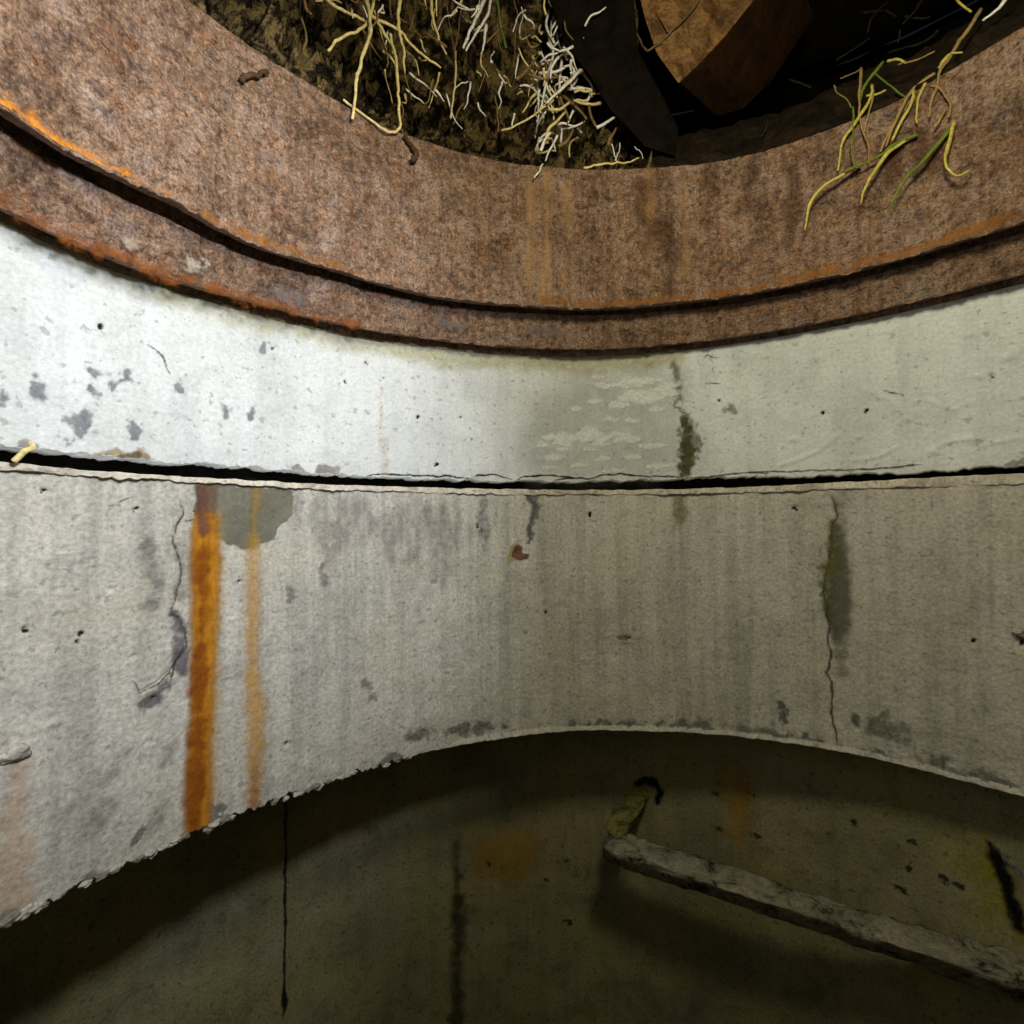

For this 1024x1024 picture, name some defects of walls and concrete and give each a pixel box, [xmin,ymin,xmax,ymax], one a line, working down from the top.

rust [0,100,153,189]
rust [34,220,193,285]
rust [205,282,362,327]
damp [672,363,702,469]
damp [195,484,293,549]
crack [136,506,191,708]
rust [185,485,220,833]
rust [247,539,264,809]
crack [818,501,850,739]